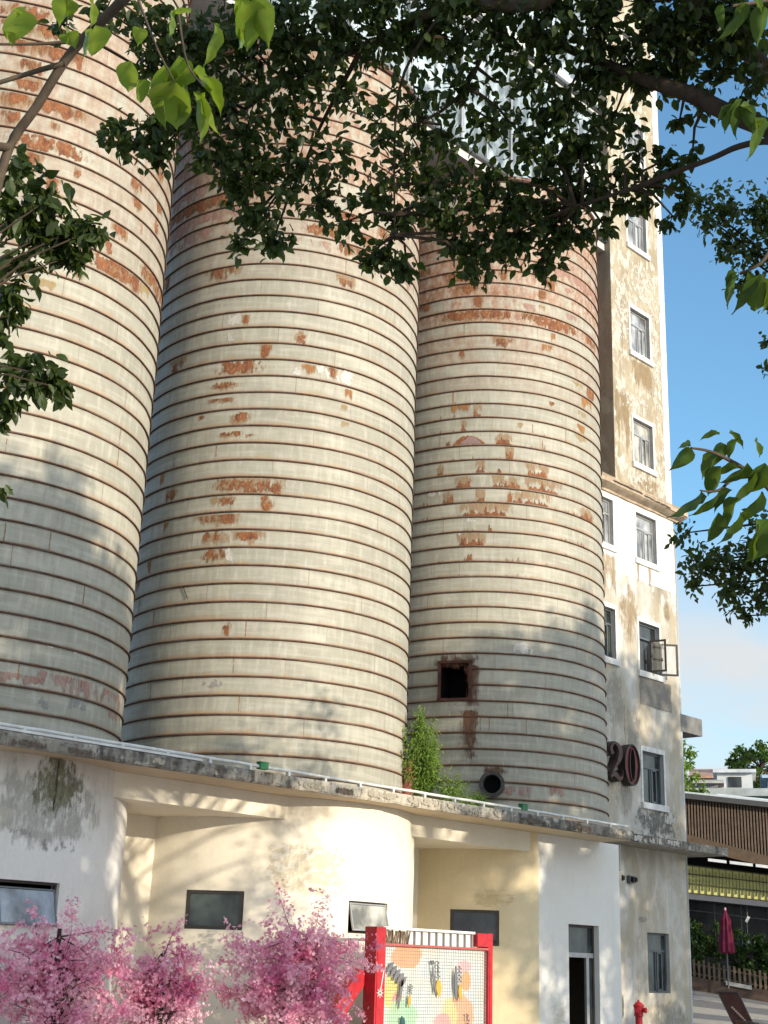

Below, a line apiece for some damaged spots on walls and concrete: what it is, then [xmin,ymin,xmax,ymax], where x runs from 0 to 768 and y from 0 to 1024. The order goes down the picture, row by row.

peeling [316,366,354,386]
rust [441,655,490,758]